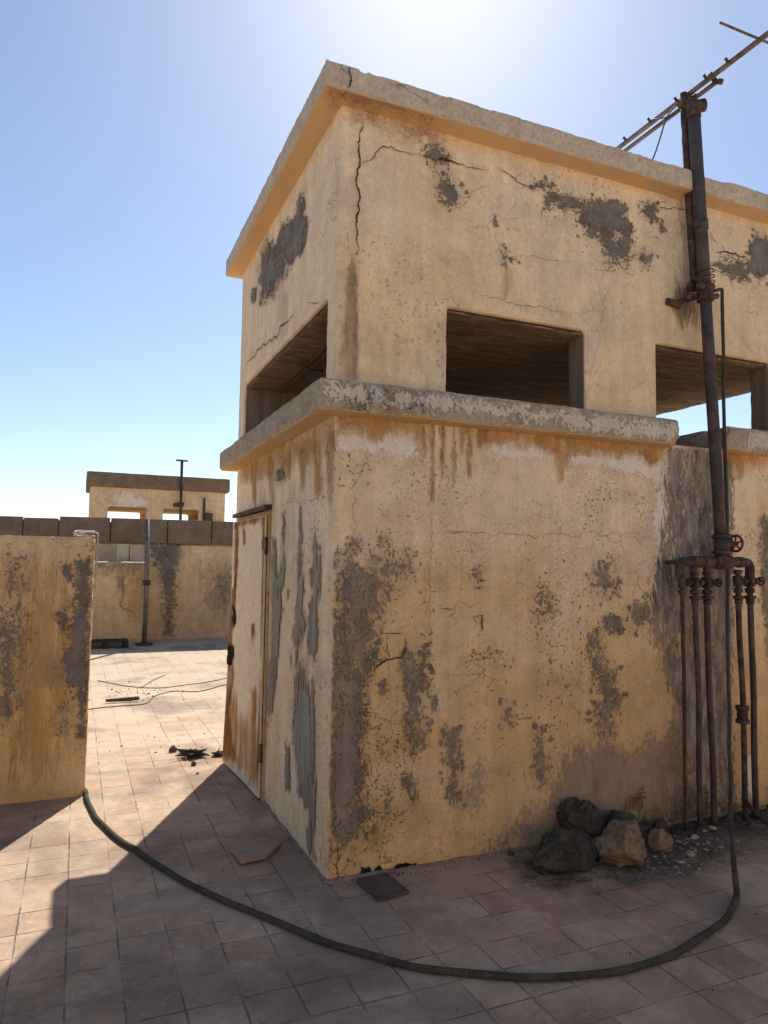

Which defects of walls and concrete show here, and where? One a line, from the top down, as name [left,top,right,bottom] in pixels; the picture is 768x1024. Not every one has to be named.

peeling [250,192,308,308]
crack [249,117,545,361]
peeling [419,143,469,212]
peeling [530,175,667,276]
peeling [711,227,768,289]
peeling [281,355,679,443]
peeling [46,543,185,745]
corrosion [229,517,264,646]
peeling [266,507,321,863]
peeling [330,529,467,874]
peeling [526,549,654,740]
water stain [466,429,768,888]